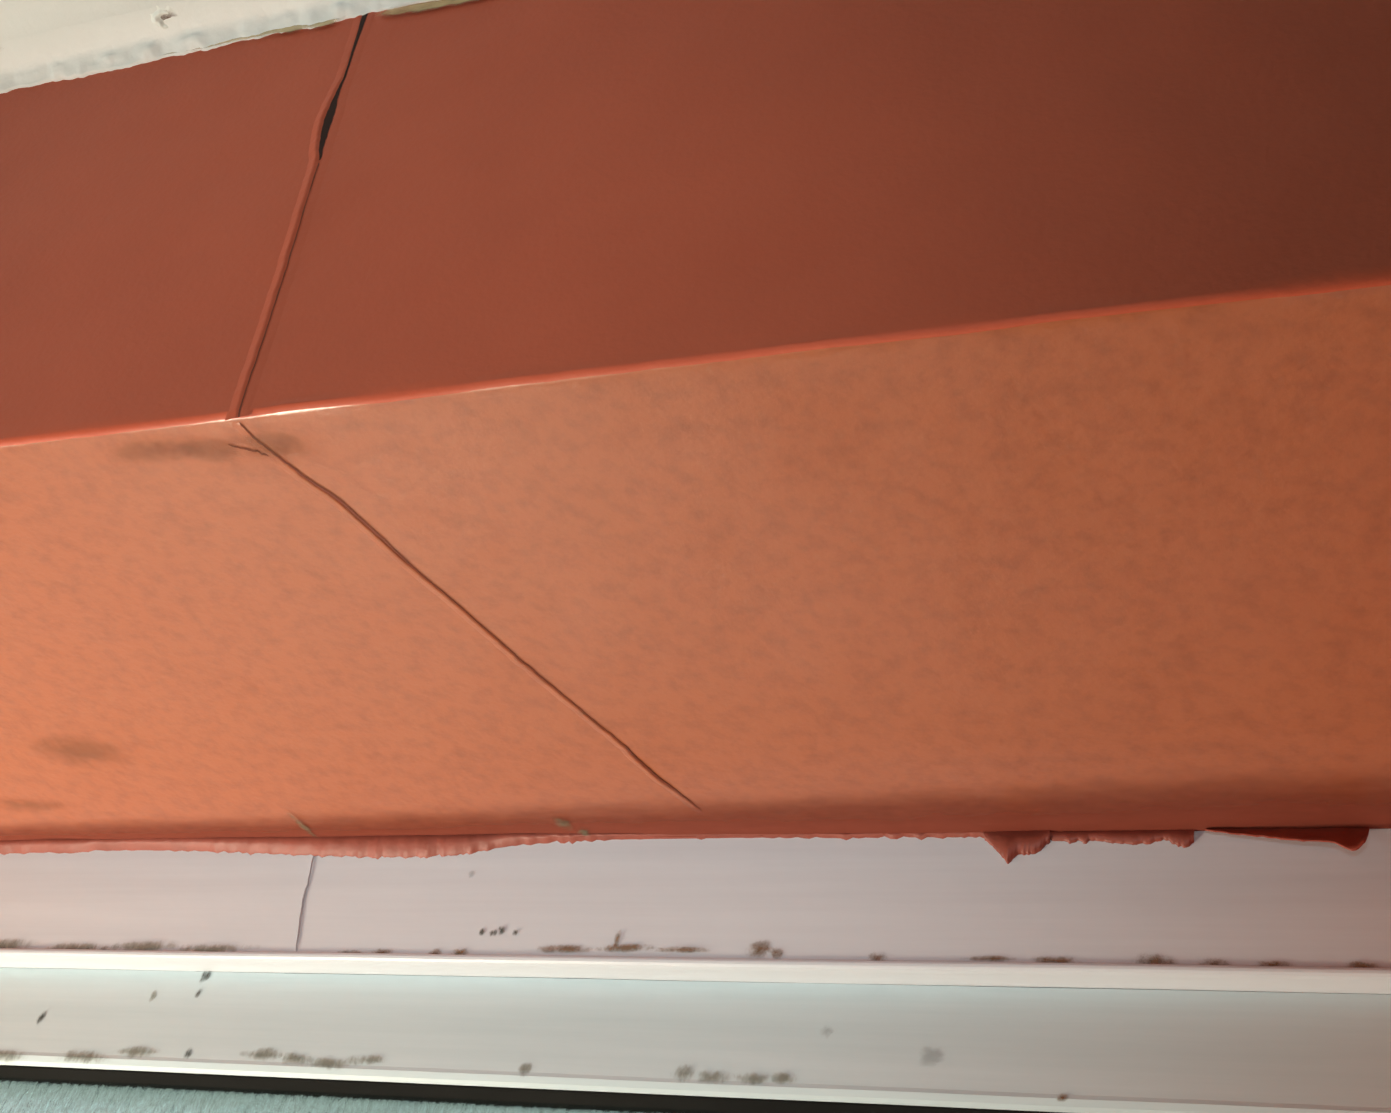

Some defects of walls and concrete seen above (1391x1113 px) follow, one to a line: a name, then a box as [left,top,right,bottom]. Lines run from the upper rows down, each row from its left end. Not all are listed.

crack [225,12,703,812]
peeling [1205,828,1370,851]
rust [607,934,639,951]
rust [753,944,782,956]